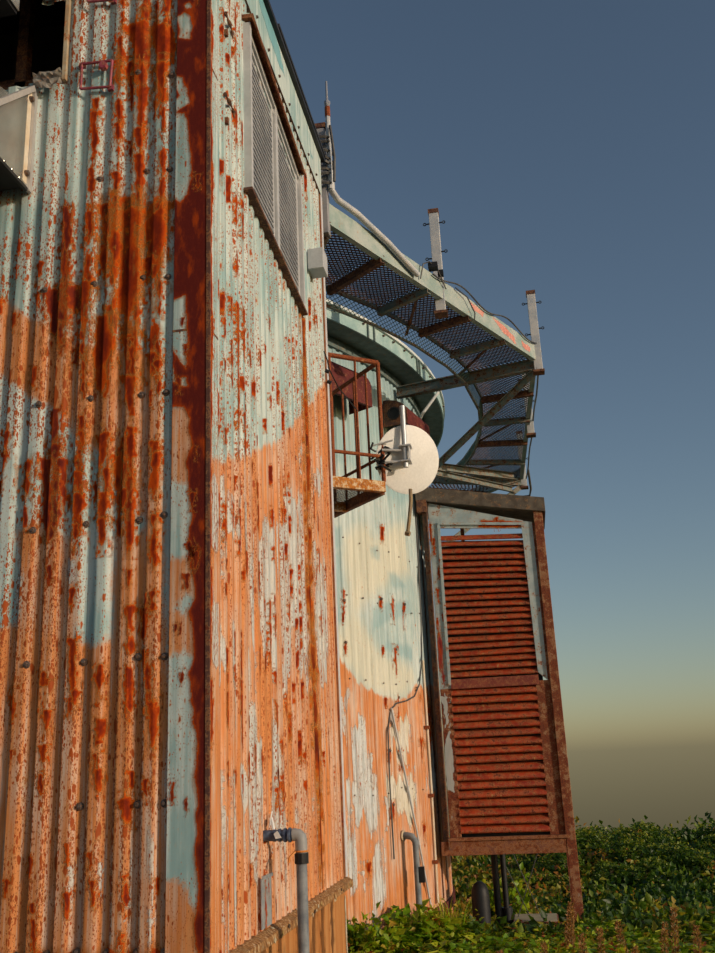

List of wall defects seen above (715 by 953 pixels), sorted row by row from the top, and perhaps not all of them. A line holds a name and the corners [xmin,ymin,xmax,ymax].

rust [0,0,335,953]
peeling [211,457,328,953]
peeling [334,687,438,953]
rust [420,695,434,759]